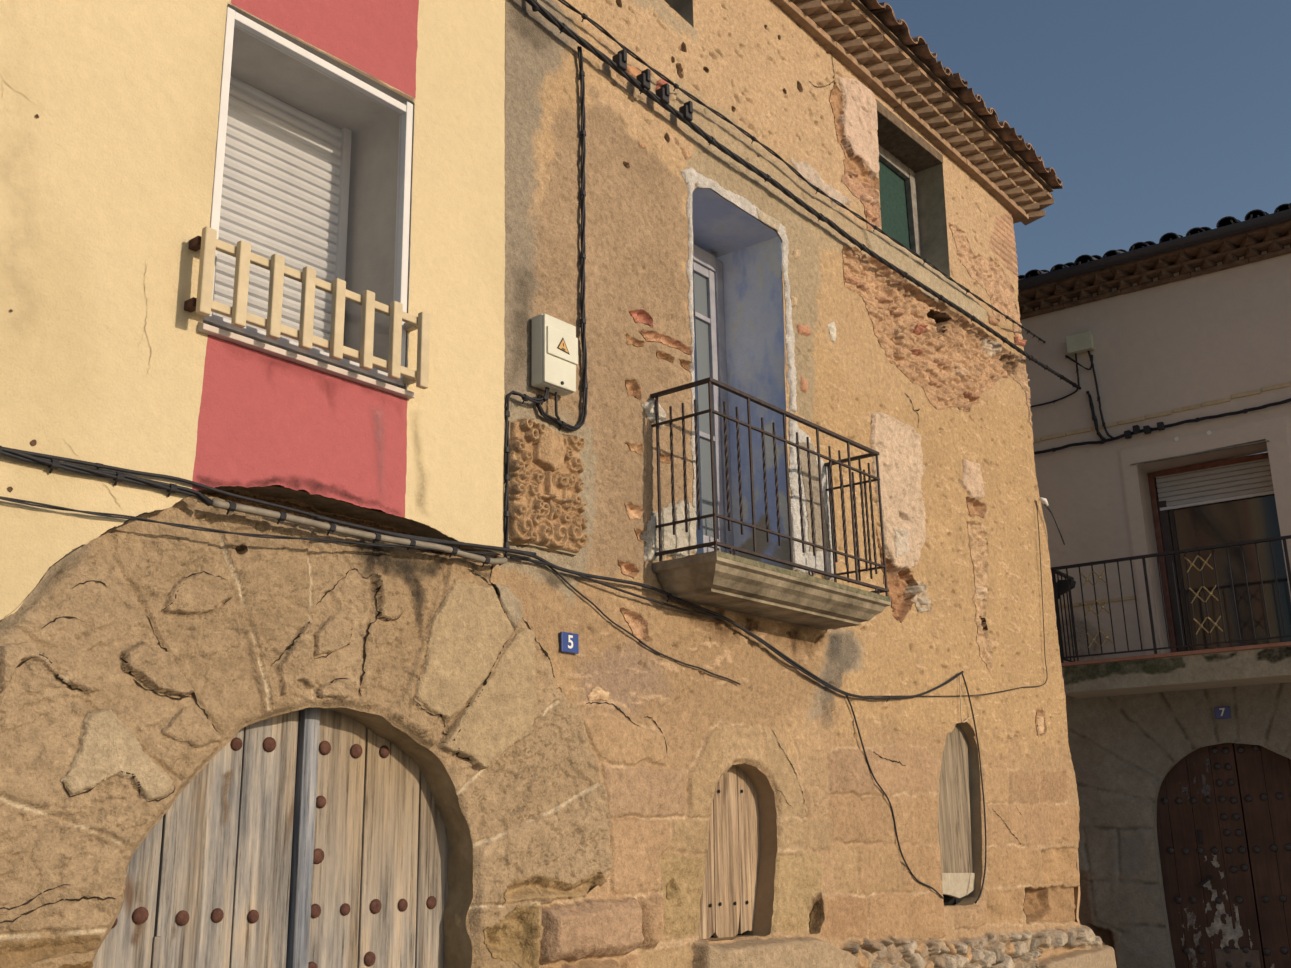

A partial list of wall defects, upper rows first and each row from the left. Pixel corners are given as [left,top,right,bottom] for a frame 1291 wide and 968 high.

peeling [790,77,882,230]
peeling [618,148,834,581]
spalling [842,223,1033,426]
crack [270,568,402,695]
damp [823,635,857,715]
peeling [870,412,932,623]
spalling [962,459,993,671]